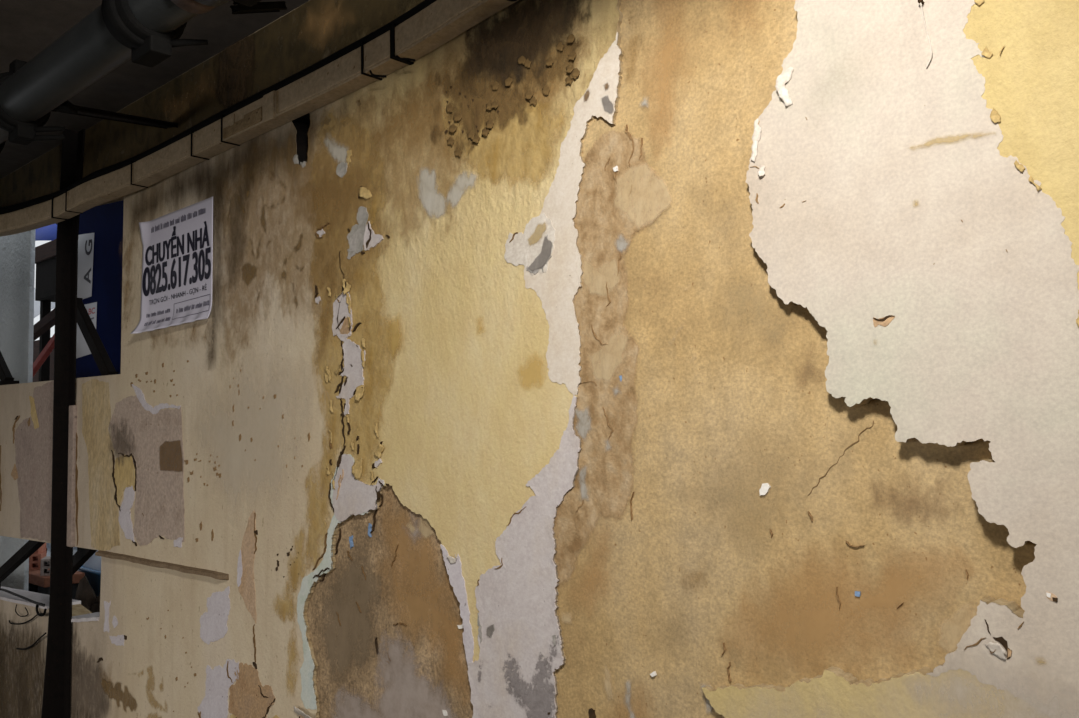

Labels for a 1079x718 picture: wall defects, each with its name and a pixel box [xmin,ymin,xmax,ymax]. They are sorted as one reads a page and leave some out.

leakage [82,0,424,178]
leakage [0,144,62,207]
leakage [134,0,590,621]
flaking render [276,0,1079,718]
peeling [82,363,221,551]
peeling [200,511,258,645]
leakage [0,624,45,718]
leakage [70,630,167,718]
peeling [175,659,279,718]